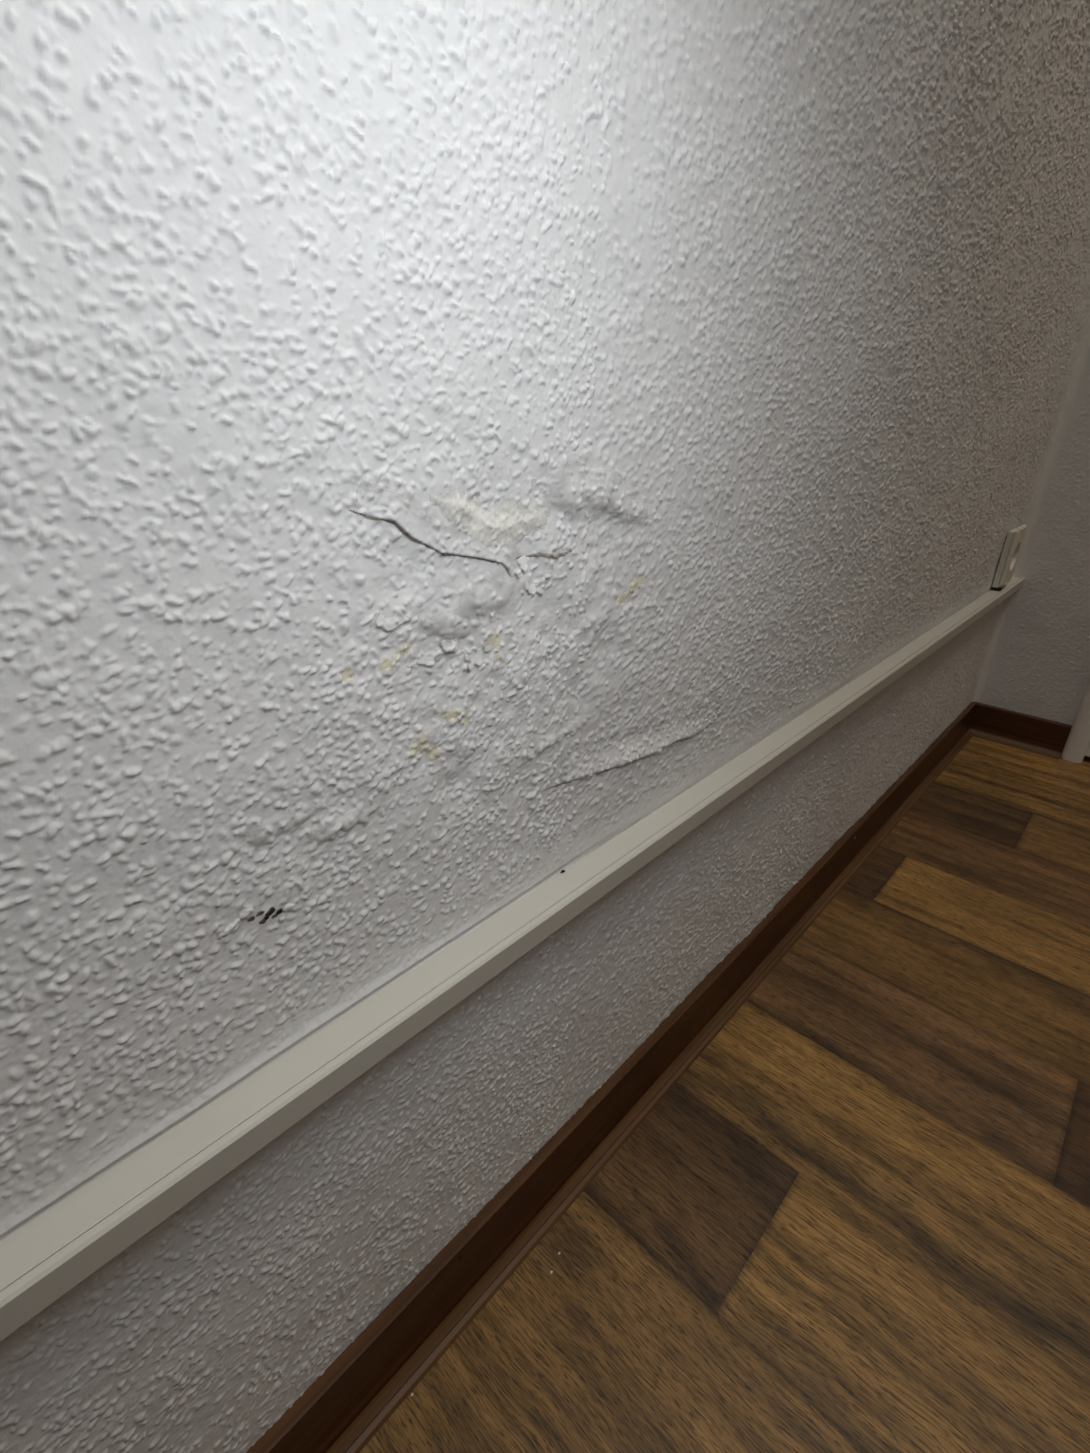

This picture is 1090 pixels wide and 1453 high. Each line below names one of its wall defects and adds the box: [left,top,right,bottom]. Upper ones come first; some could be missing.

crack [349,487,571,580]